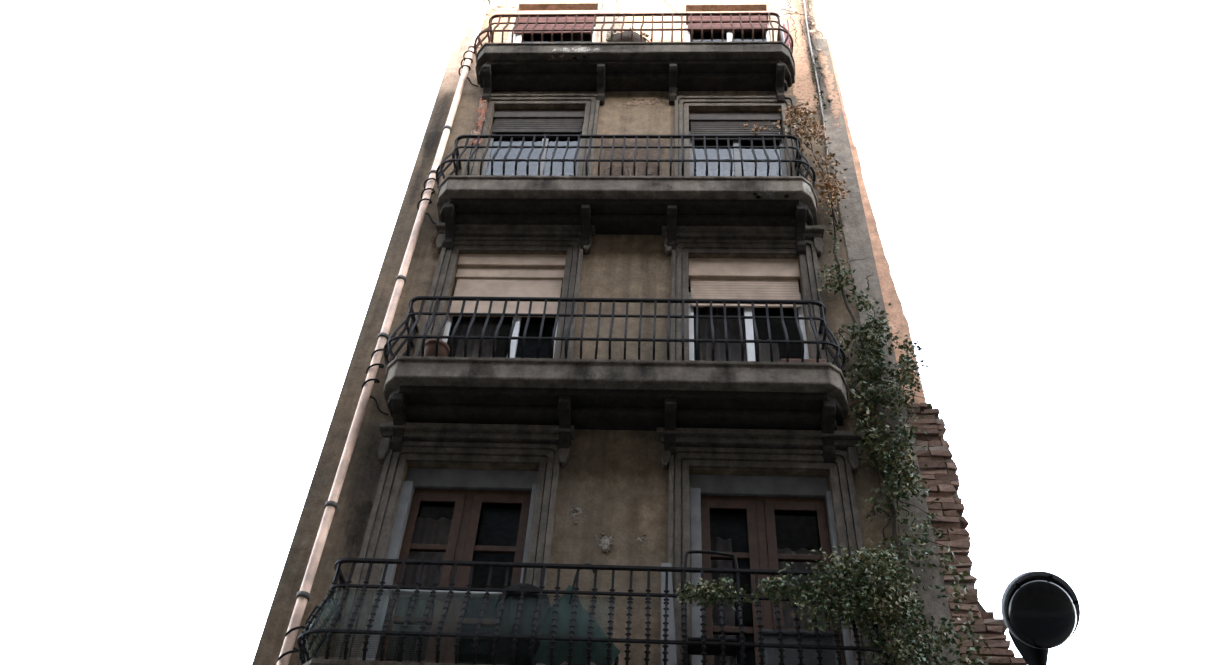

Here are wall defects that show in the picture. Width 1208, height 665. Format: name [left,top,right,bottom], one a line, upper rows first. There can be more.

flaking render [620,0,684,42]
flaking render [774,0,842,125]